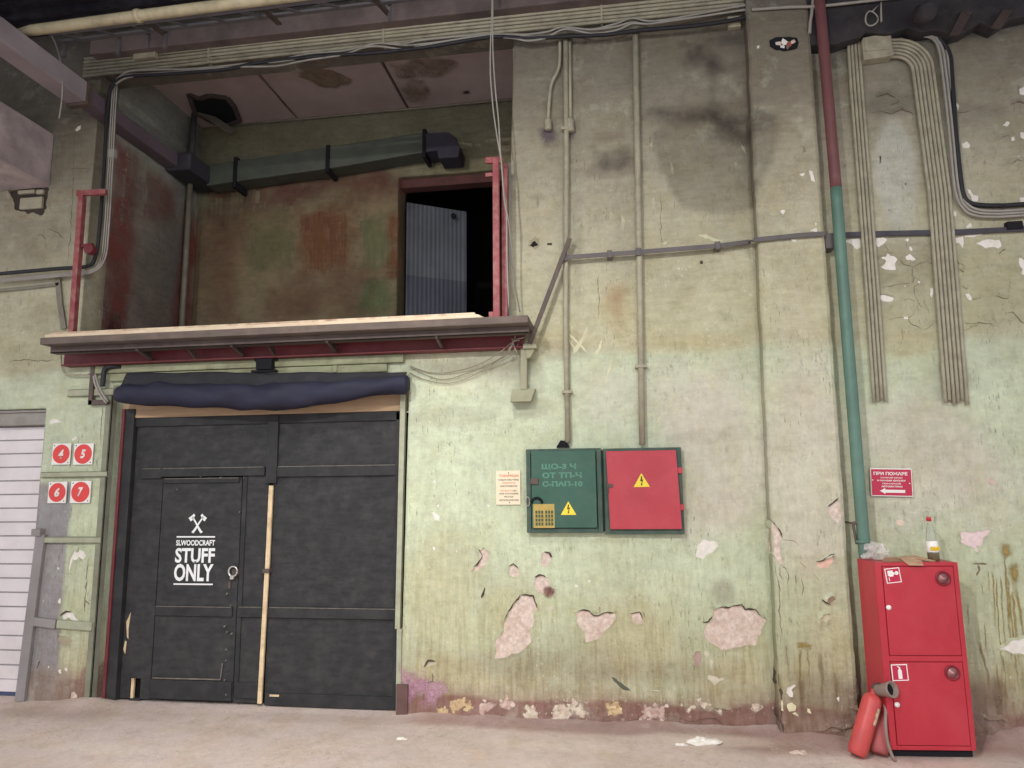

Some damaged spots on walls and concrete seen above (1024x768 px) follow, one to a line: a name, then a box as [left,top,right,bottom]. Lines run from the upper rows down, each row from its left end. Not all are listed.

water stain [301,69,351,88]
spalling [186,93,242,127]
crack [868,91,915,115]
peeling [955,223,1004,251]
crack [884,243,933,330]
crack [963,293,1024,339]
spalling [492,549,559,662]
spalling [573,607,645,645]
spalling [701,602,768,685]
peeling [436,693,538,718]
peeling [551,698,589,720]
peeling [639,689,722,721]